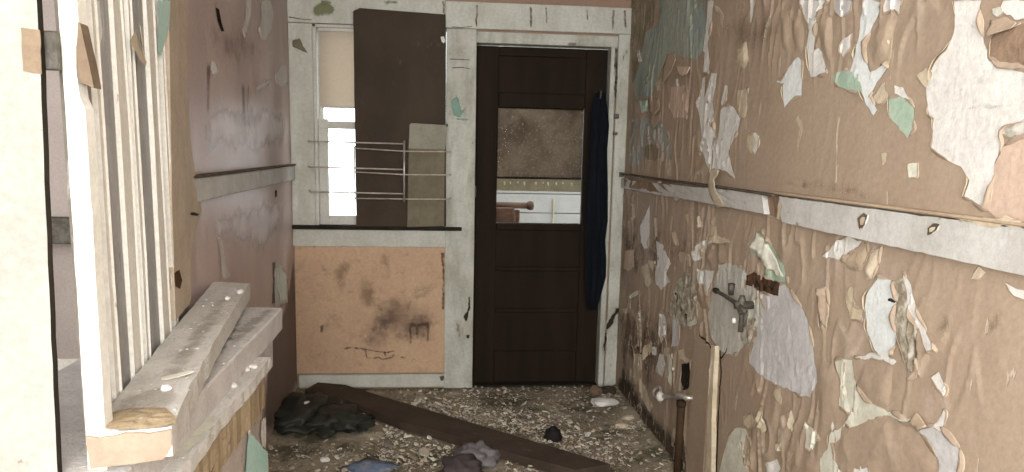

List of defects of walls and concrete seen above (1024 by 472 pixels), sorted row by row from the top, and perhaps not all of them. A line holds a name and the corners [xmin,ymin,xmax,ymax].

leakage [211,111,282,149]
peeling [242,0,274,40]
peeling [624,0,760,208]
peeling [777,0,1024,229]
spalling [602,204,965,472]